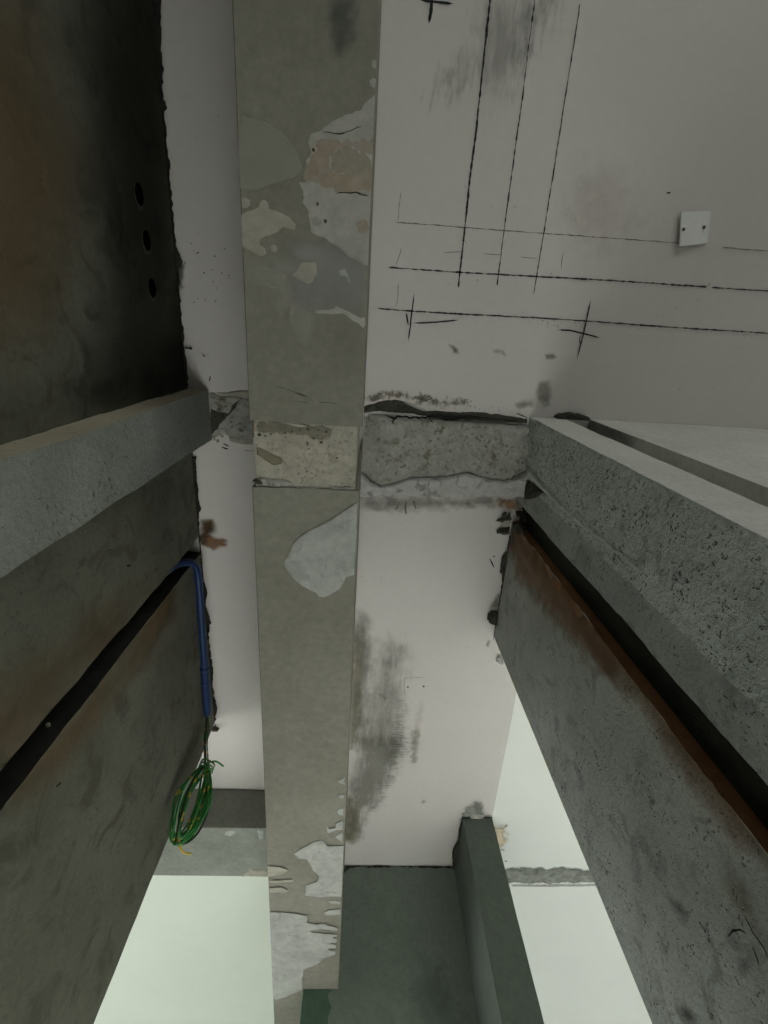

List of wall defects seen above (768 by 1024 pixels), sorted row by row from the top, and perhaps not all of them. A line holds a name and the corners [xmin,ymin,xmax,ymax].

peeling [299,95,375,282]
peeling [315,306,365,328]
crack [383,414,469,424]
spalling [364,399,527,423]
corrosion [201,520,226,550]
damp [346,619,395,839]
corrosion [510,528,757,842]
peeling [270,840,344,1000]